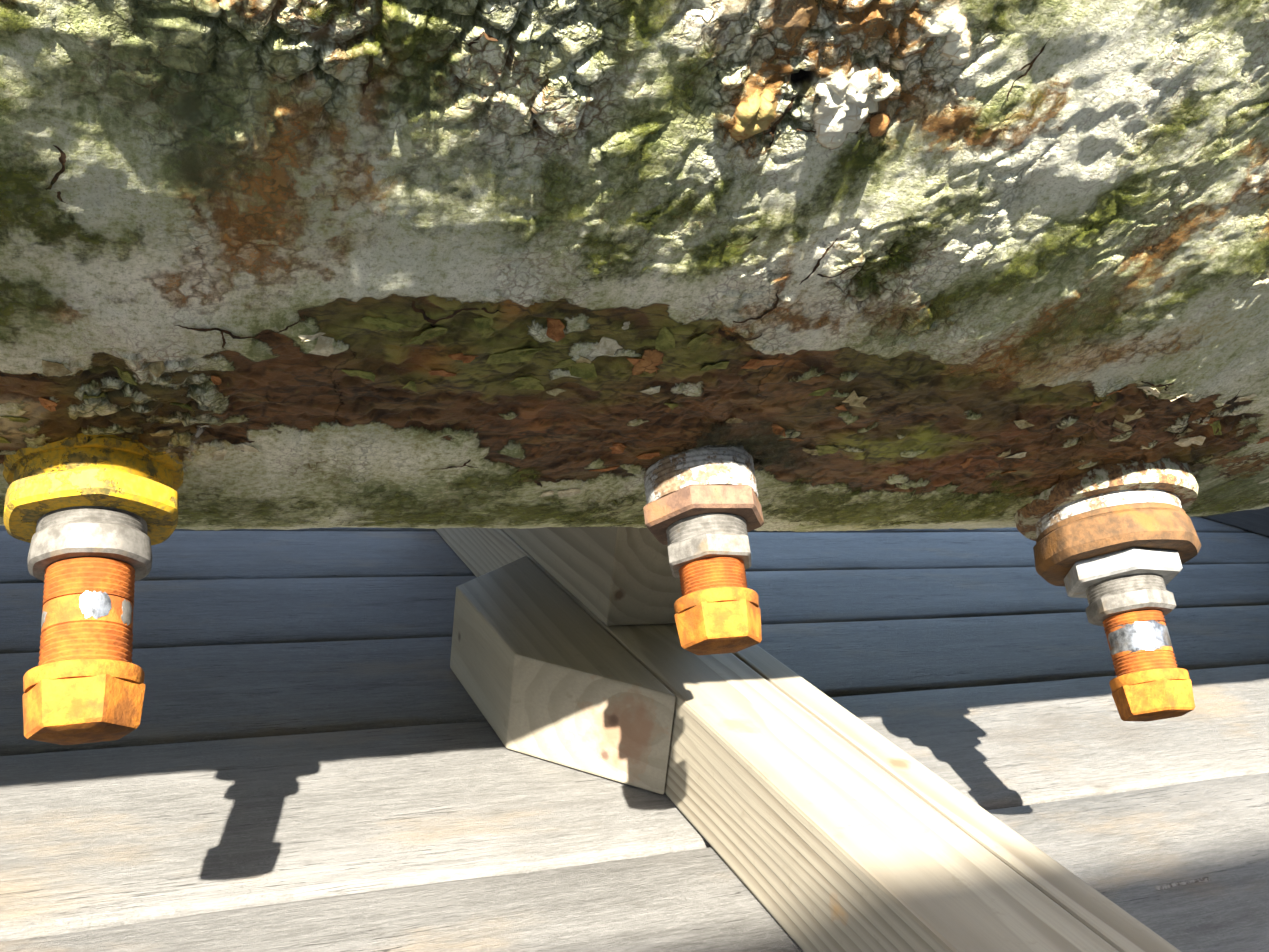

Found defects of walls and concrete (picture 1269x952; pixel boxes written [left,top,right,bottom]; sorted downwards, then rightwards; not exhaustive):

damp [0,1,30,35]
crack [45,145,68,204]
corrosion [150,73,392,308]
corrosion [360,51,403,126]
damp [374,68,593,240]
crack [763,94,821,148]
spalling [791,69,813,85]
crack [1006,39,1050,102]
damp [30,209,143,265]
damp [577,177,735,282]
corrosion [942,139,1269,386]
peeling [0,294,1269,498]